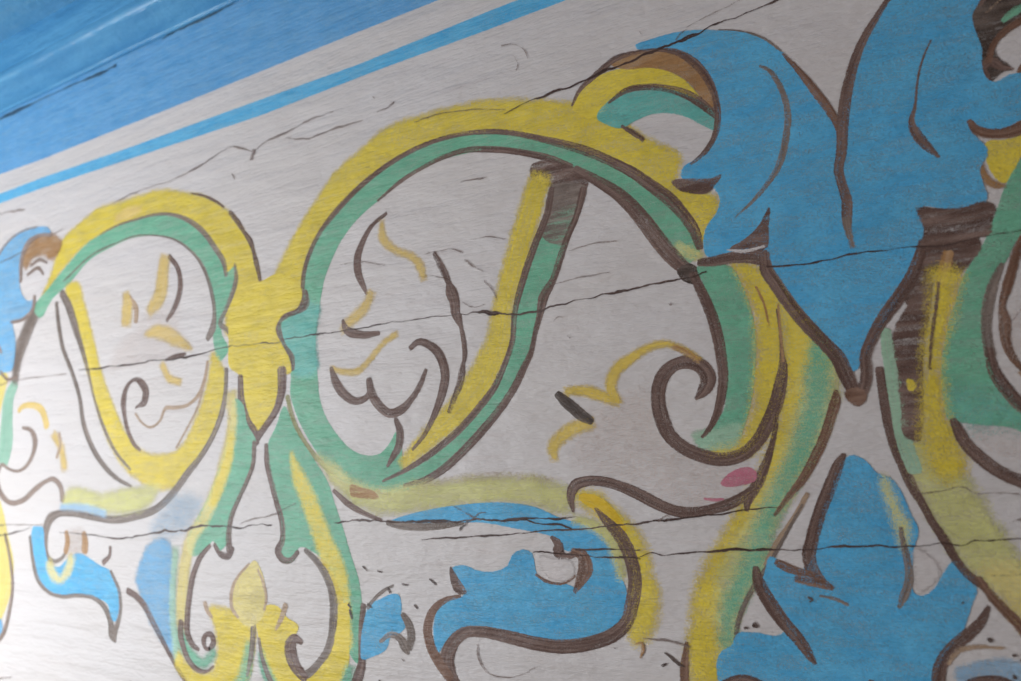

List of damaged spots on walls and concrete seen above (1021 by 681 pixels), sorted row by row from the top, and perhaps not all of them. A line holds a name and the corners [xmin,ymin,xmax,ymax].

crack [766,230,1021,268]
crack [0,271,706,385]
crack [335,506,1021,559]